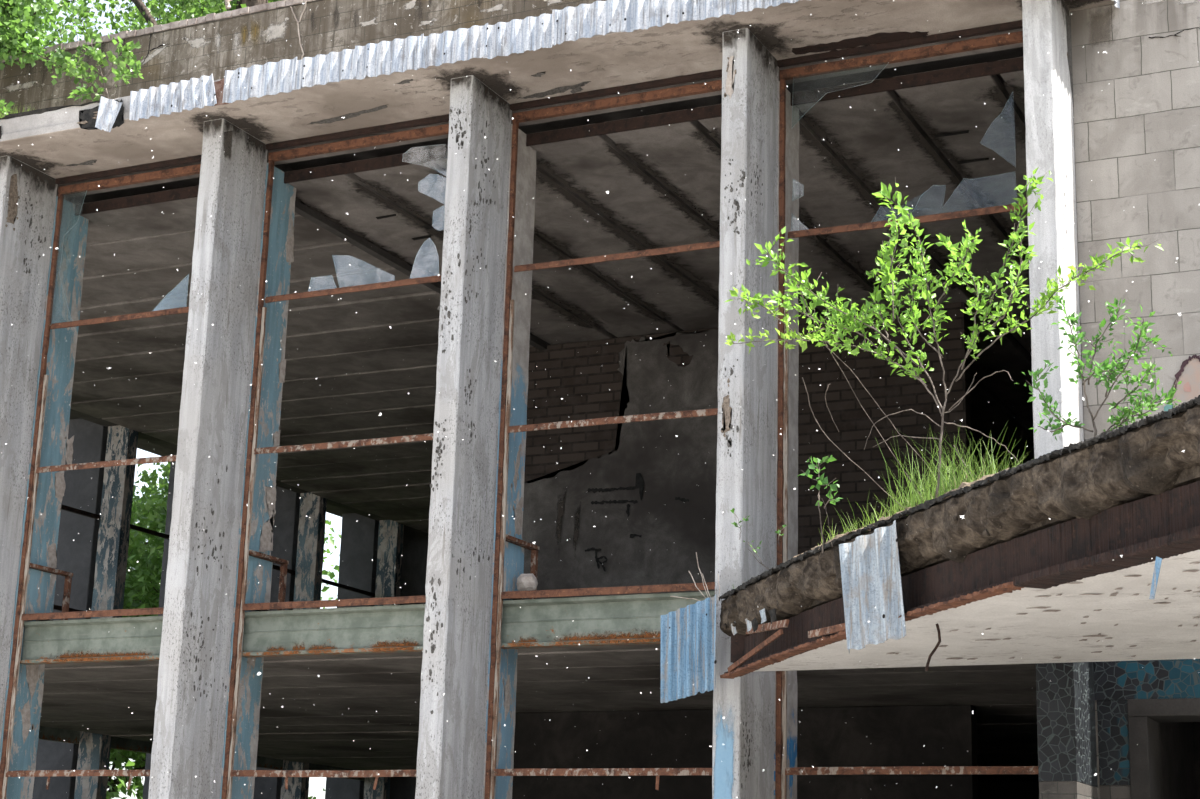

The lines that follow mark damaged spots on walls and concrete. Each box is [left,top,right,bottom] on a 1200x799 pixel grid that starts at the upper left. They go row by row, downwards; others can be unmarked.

leakage [702,21,798,72]
peeling [277,359,286,388]
peeling [273,424,281,447]
peeling [54,436,74,511]
peeling [511,329,1200,637]
peeling [259,480,276,556]
corrosion [47,651,149,662]
corrosion [263,644,337,655]
corrosion [371,640,419,651]
corrosion [559,631,661,645]
peeling [1079,610,1118,653]
peeling [18,664,40,743]